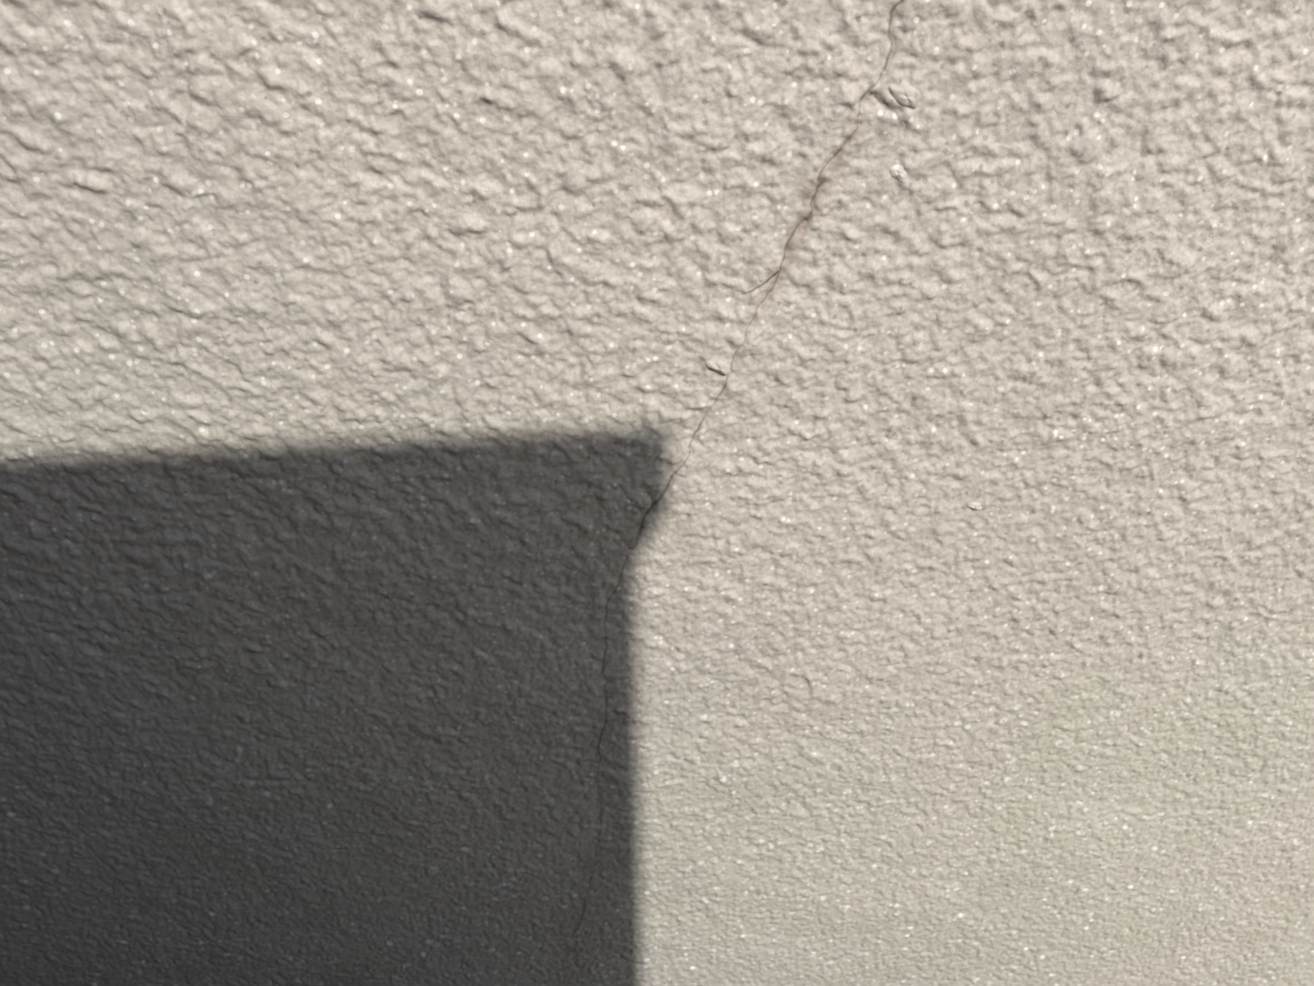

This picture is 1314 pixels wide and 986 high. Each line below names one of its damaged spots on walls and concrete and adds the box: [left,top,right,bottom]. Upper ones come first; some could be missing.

crack [860,0,903,122]
crack [739,246,787,316]